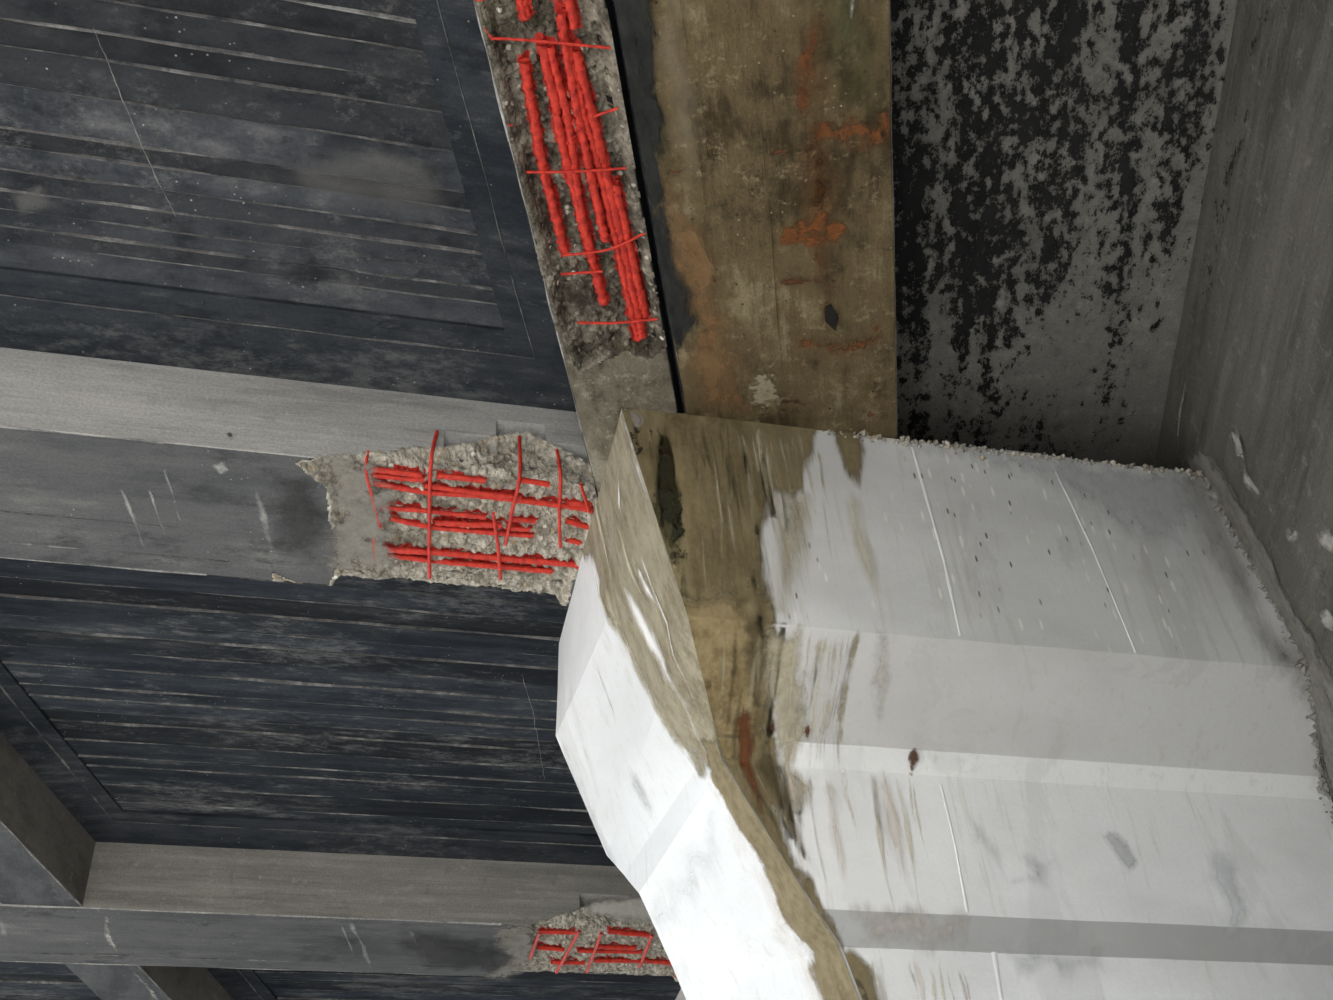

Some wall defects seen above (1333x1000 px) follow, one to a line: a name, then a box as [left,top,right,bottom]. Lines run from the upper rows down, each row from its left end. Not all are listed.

crack [93,27,176,217]
spalling [475,0,667,374]
rust [780,112,890,285]
damp [890,0,1245,460]
spalling [272,573,301,583]
spalling [295,430,598,606]
damp [583,374,879,1000]
damp [875,789,920,853]
spalling [485,900,678,982]